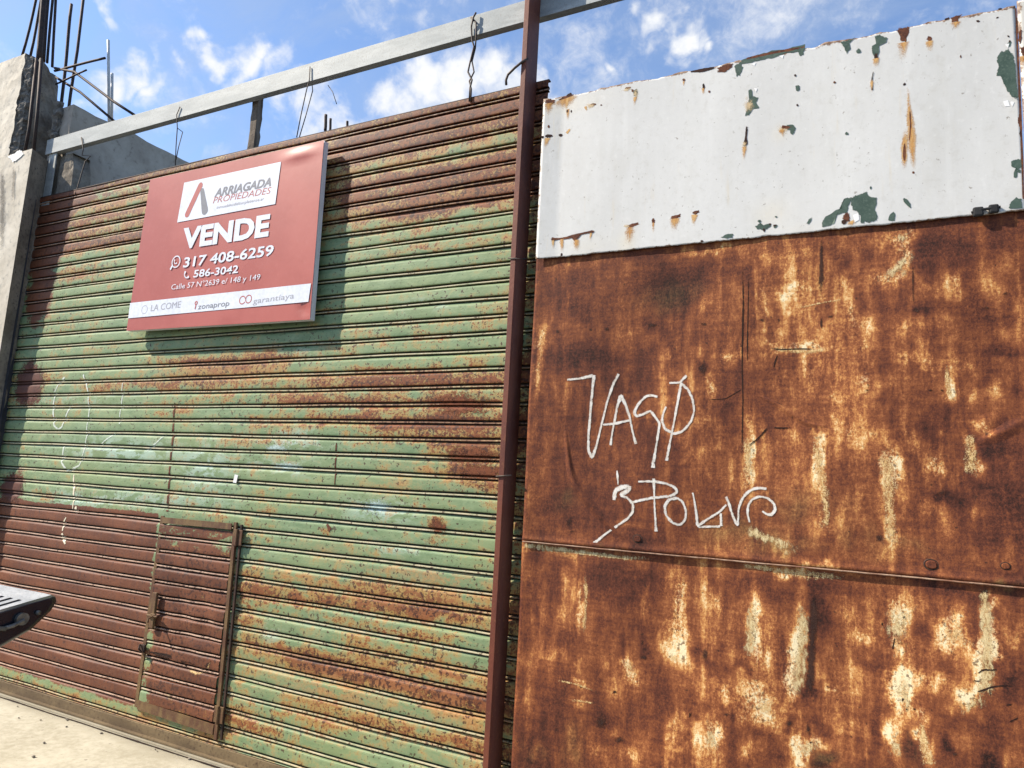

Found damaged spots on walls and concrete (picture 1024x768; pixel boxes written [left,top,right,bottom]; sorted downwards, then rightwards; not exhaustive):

peeling [691,44,805,93]
peeling [841,35,887,90]
corrosion [896,27,909,52]
peeling [996,35,1018,106]
corrosion [545,93,602,115]
peeling [742,88,759,155]
corrosion [901,83,916,174]
corrosion [551,230,594,256]
corrosion [670,210,699,228]
peeling [806,186,895,227]
corrosion [430,390,495,426]
corrosion [434,443,500,499]